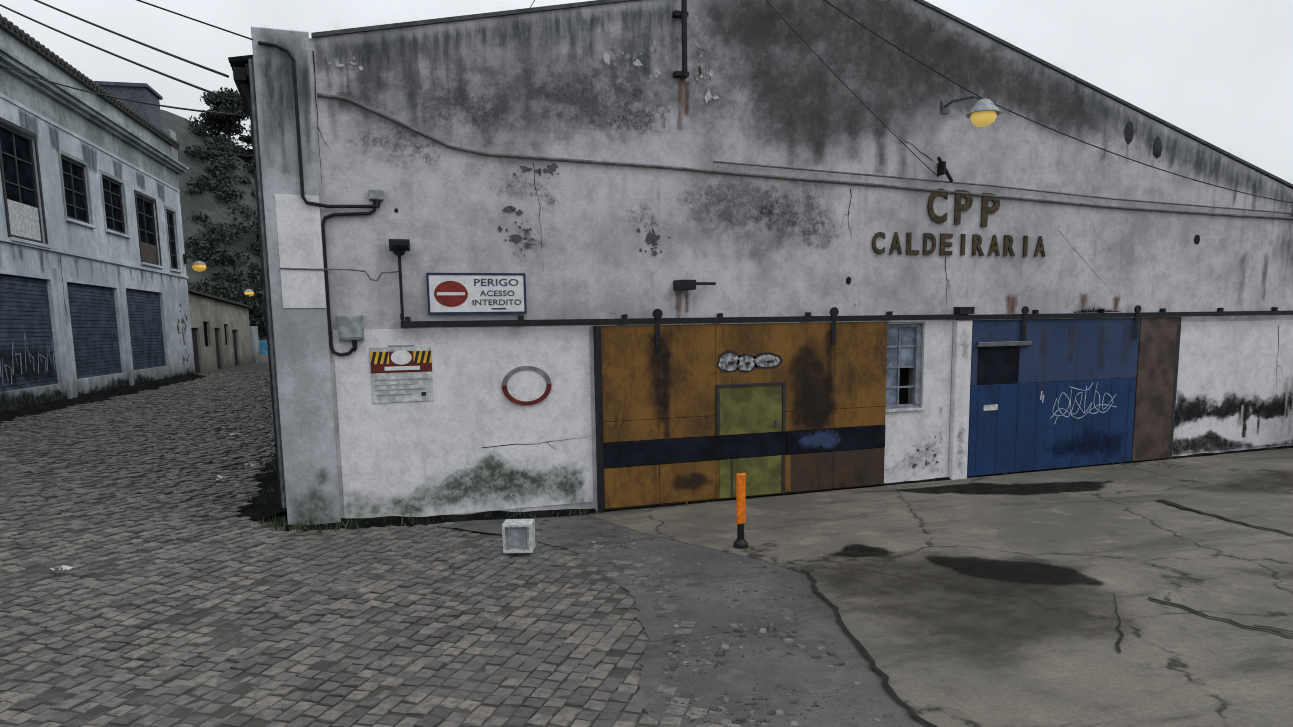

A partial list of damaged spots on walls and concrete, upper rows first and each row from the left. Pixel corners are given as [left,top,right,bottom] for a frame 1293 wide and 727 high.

damp [266,42,308,122]
damp [318,16,604,116]
spalling [514,163,559,178]
damp [1197,149,1291,200]
spalling [498,206,534,248]
damp [1172,378,1293,455]
mould [393,463,581,514]